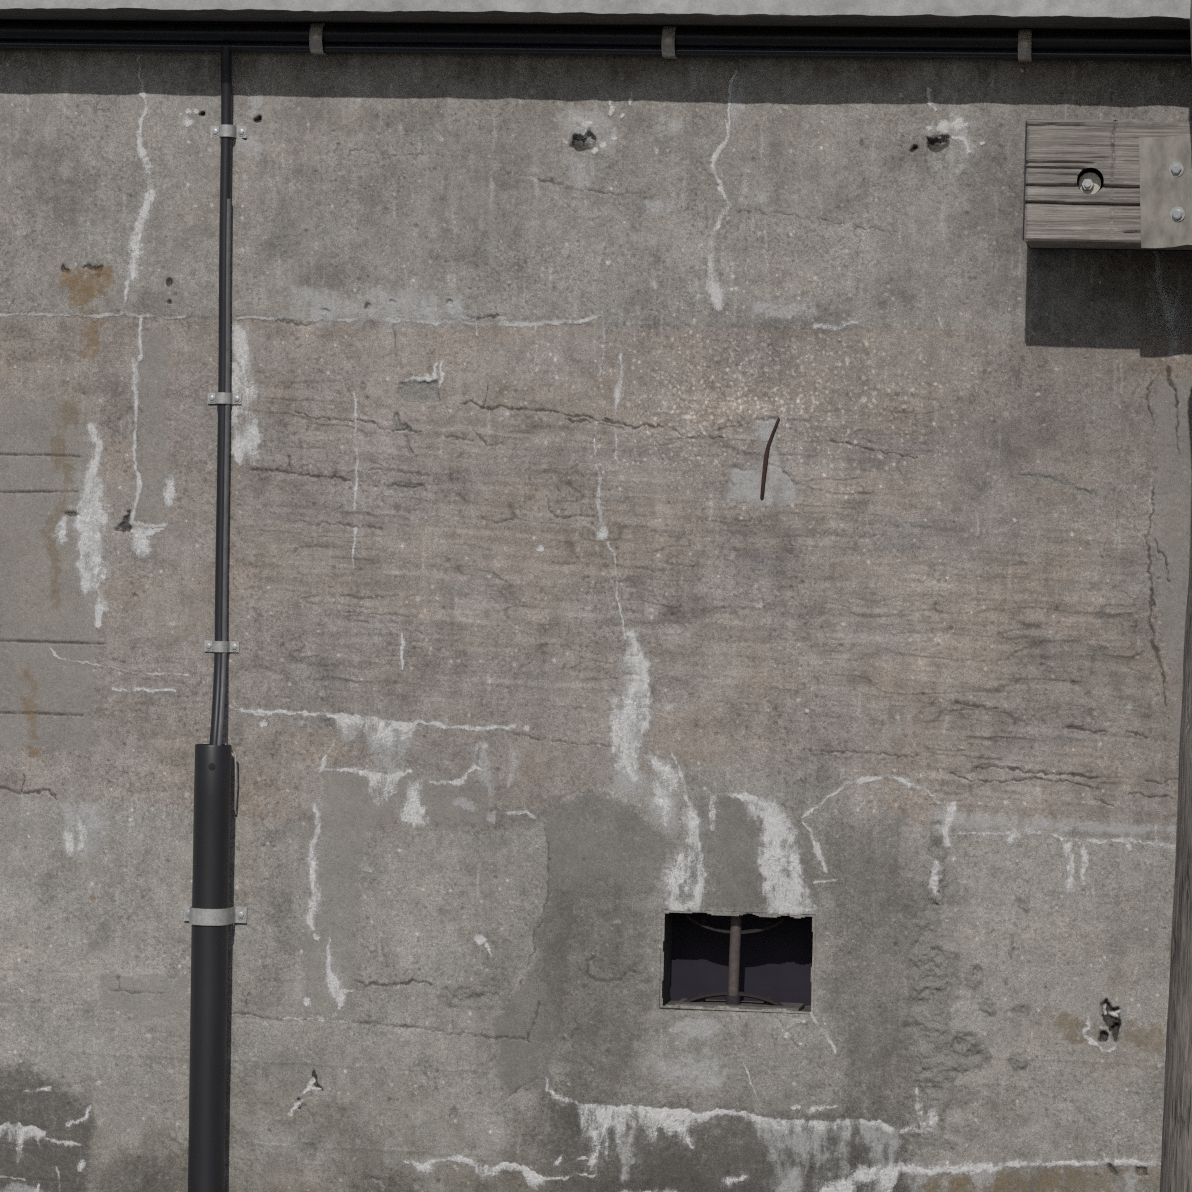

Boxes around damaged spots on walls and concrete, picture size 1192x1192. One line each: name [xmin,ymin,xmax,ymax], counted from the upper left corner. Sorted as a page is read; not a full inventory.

spalling [571,117,617,154]
peeling [608,91,633,118]
crack [459,386,724,438]
crack [830,440,918,459]
crack [1147,367,1179,449]
water stain [55,423,110,628]
crack [1145,492,1170,705]
water stain [593,419,817,915]
water stain [229,705,536,828]
spalling [902,822,992,1152]
spalling [1082,999,1122,1053]
water stain [403,1078,1155,1192]